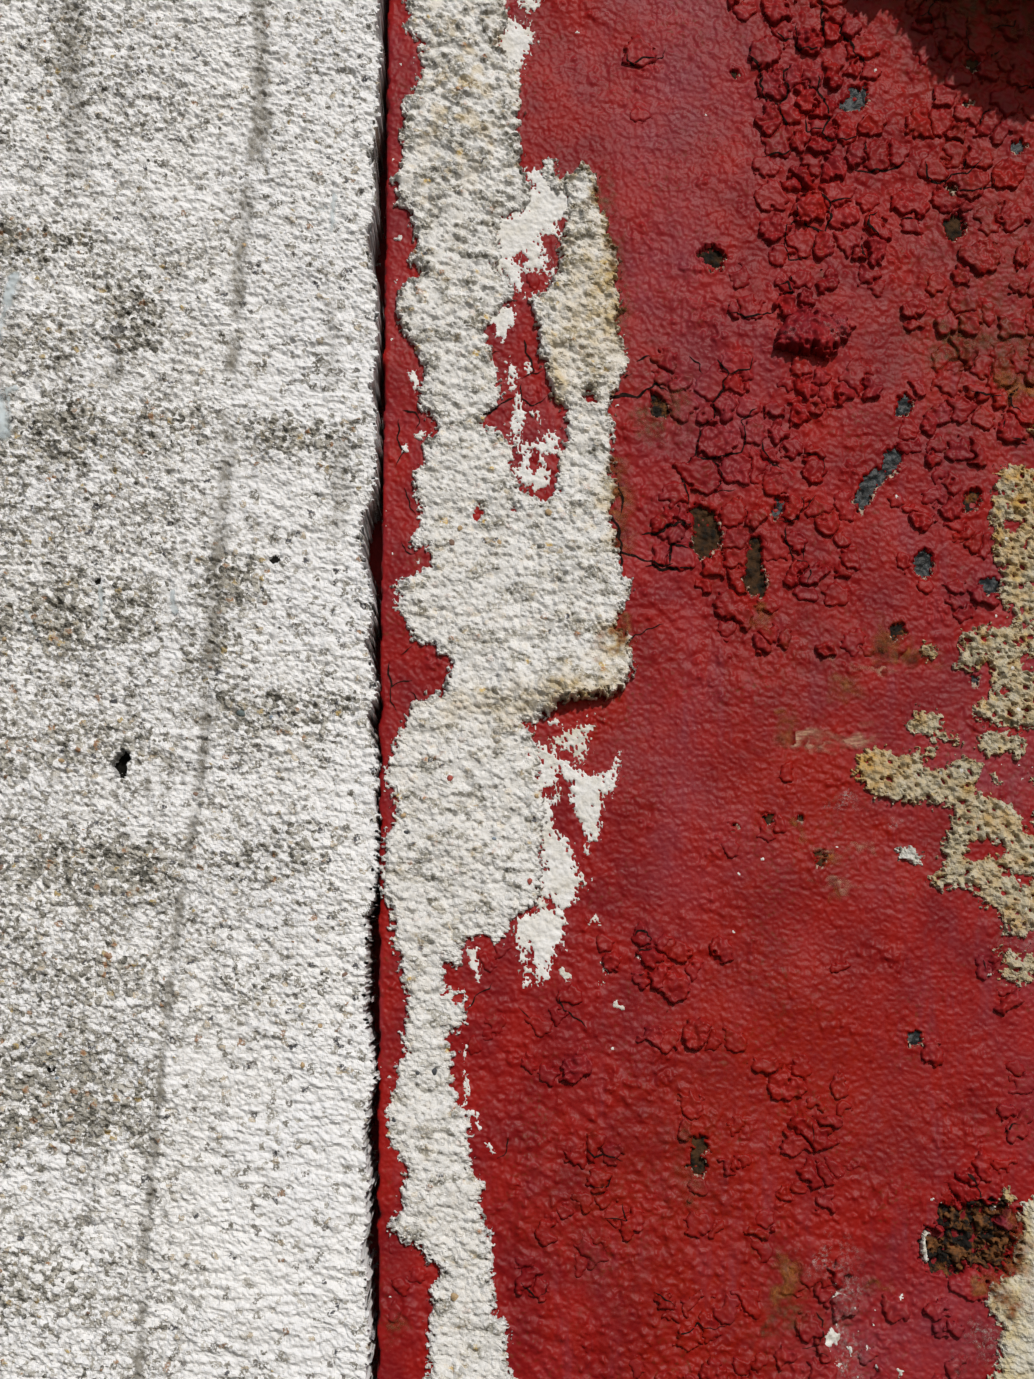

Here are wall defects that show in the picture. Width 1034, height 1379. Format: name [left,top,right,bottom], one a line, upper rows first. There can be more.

crack [626,48,666,66]
crack [729,0,996,318]
crack [967,387,1028,445]
crack [610,355,825,583]
spalling [917,1195,1023,1282]
rust [971,1213,1023,1318]